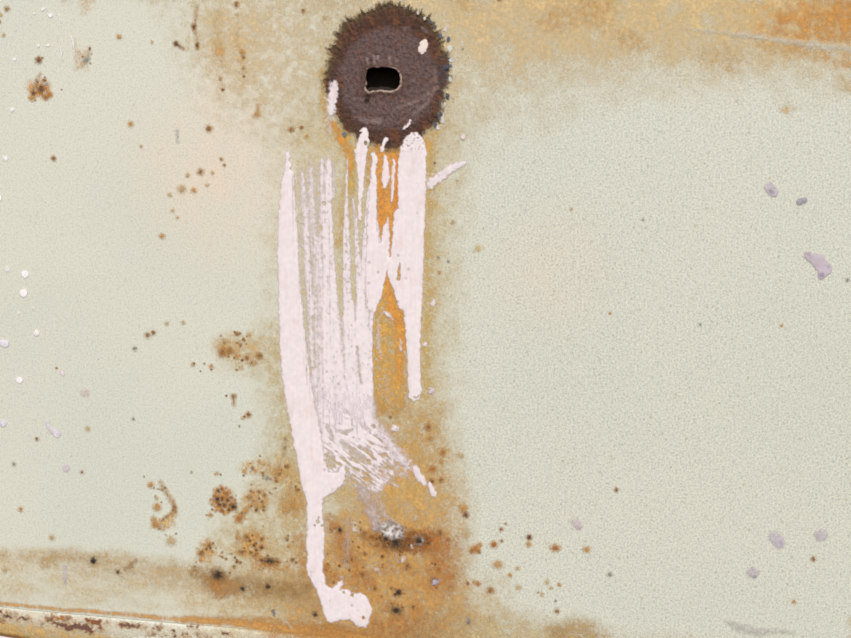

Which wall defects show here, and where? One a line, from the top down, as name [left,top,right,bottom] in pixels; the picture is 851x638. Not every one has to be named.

rust [28,79,52,101]
rust [174,0,336,117]
peeling [323,0,453,150]
rust [350,0,851,81]
rust [424,132,436,172]
rust [285,120,400,302]
rust [0,183,506,638]